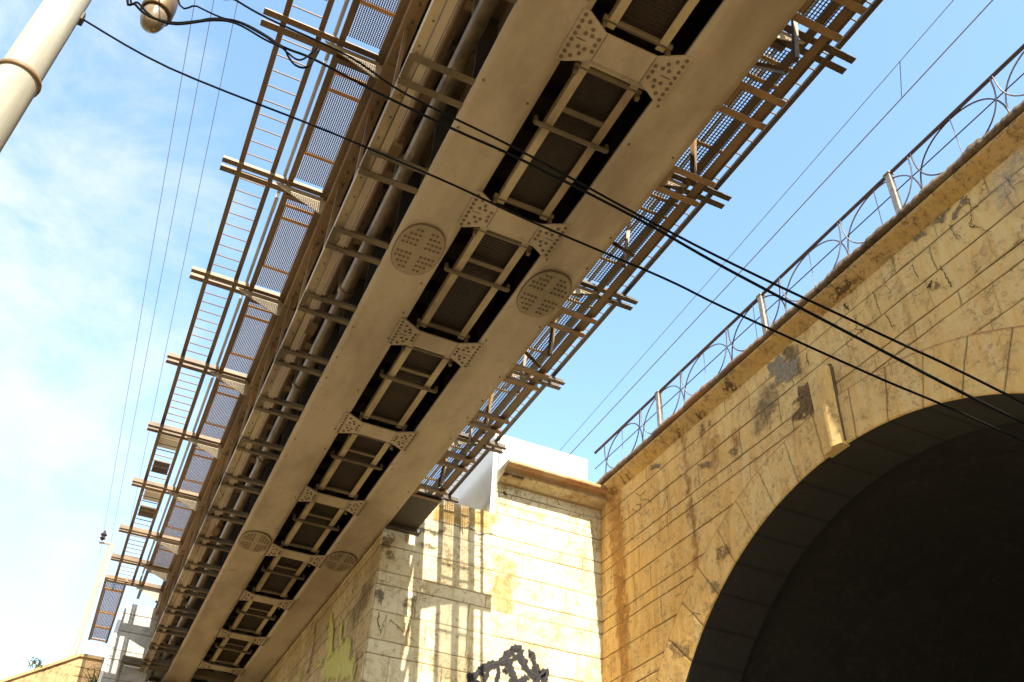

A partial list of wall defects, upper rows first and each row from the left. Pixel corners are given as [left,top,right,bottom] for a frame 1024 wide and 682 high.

crack [949,197,990,240]
peeling [767,354,814,421]
corrosion [609,487,632,682]